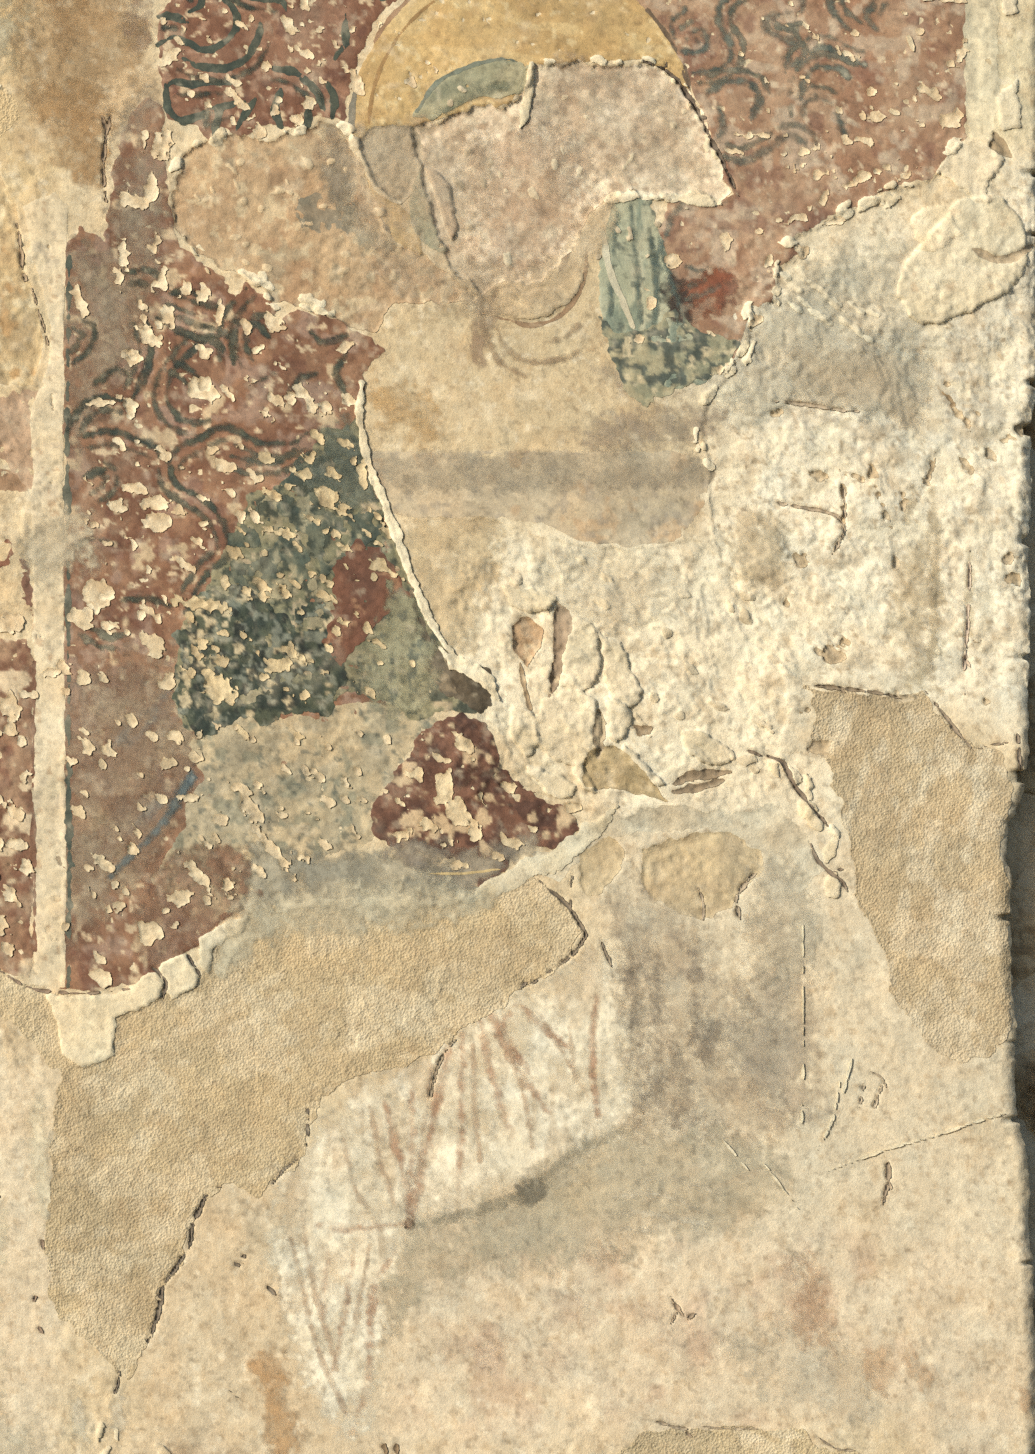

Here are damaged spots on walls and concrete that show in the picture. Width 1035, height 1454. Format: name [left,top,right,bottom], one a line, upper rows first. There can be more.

spalling [63,0,1035,946]
peeling [0,660,109,747]
peeling [0,795,35,957]
crack [747,749,847,892]
peeling [45,918,243,1067]
crack [272,1108,309,1184]
crack [145,1187,221,1344]